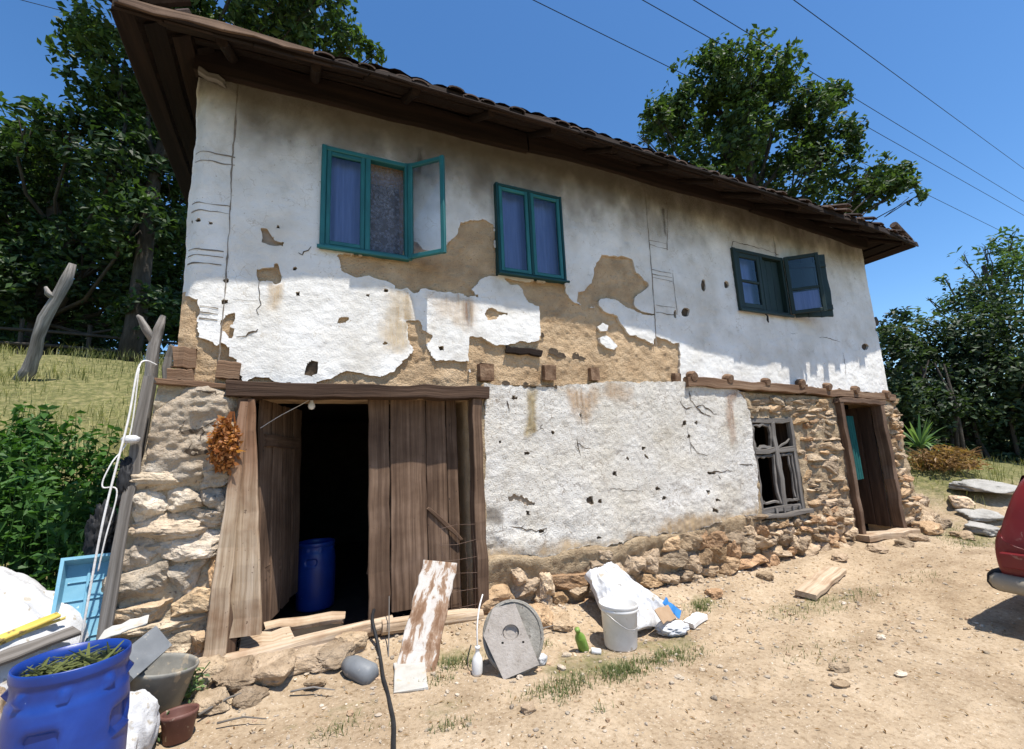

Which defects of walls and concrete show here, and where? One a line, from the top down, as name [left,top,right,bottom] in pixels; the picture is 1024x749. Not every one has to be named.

flaking render [261,227,283,246]
flaking render [257,264,282,284]
crack [233,285,261,337]
flaking render [305,220,679,400]
flaking render [176,292,273,383]
damp [526,392,535,434]
crack [680,392,753,479]